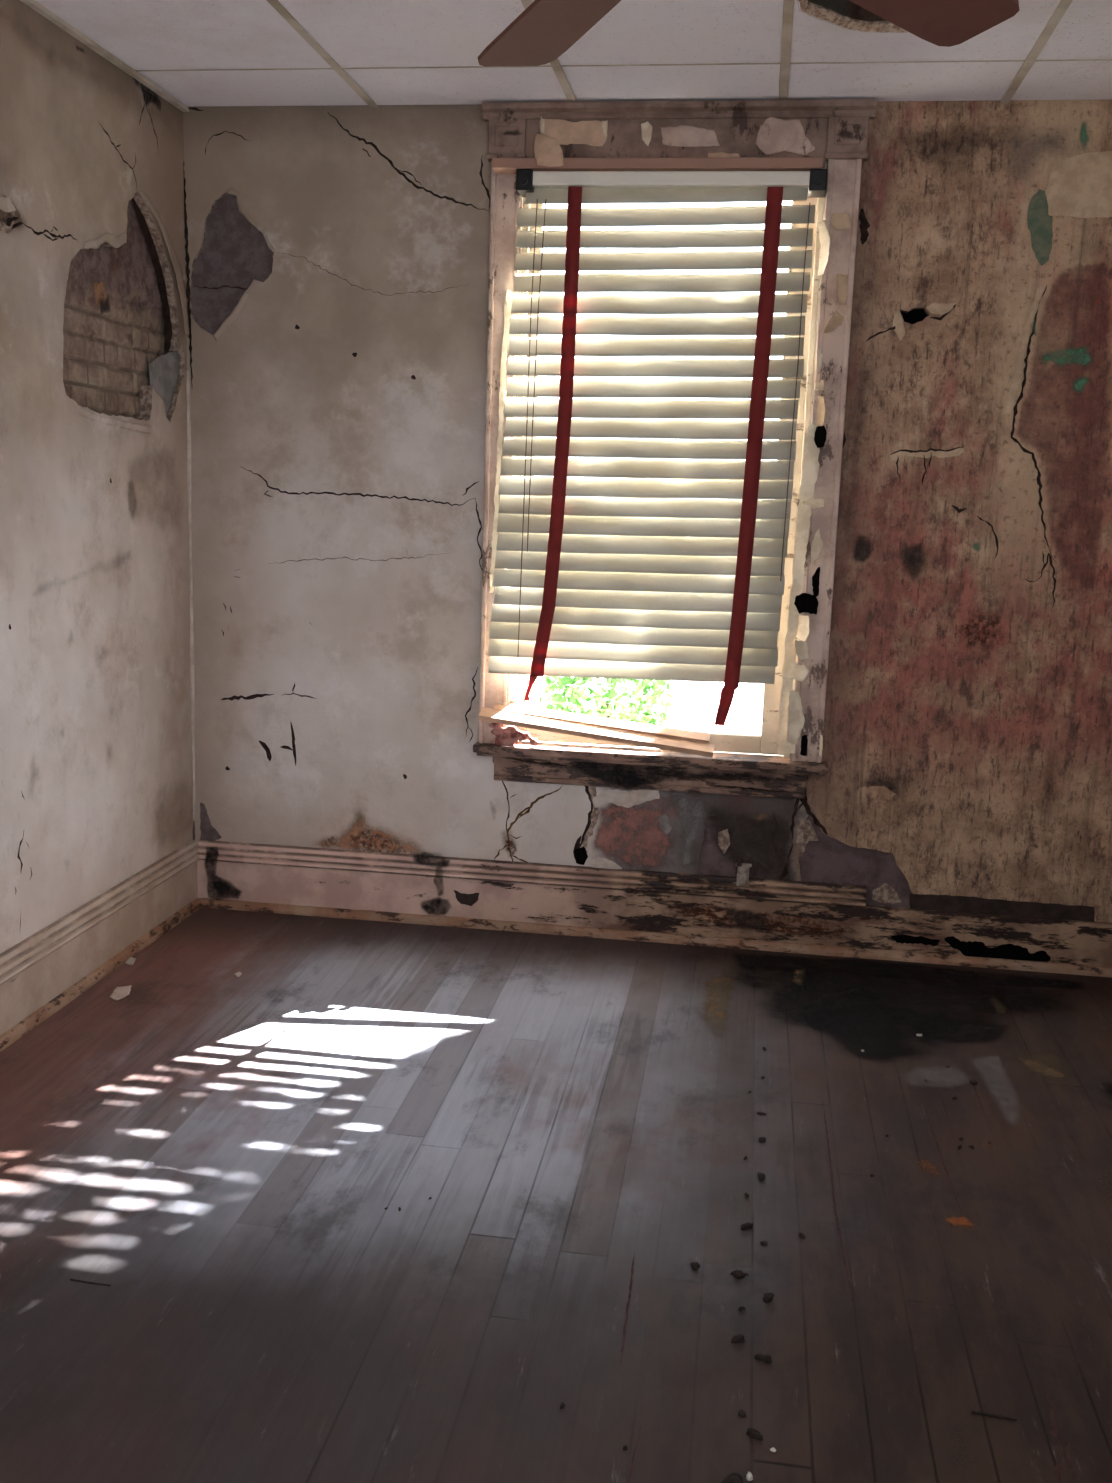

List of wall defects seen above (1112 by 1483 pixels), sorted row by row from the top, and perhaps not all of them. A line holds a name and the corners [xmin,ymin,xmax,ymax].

crack [320,113,491,222]
peeling [533,117,608,167]
peeling [755,117,815,155]
crack [22,222,77,241]
spalling [63,188,277,434]
crack [238,467,483,570]
peeling [777,213,852,757]
crack [221,683,317,701]
crack [494,757,600,865]
leakage [320,817,450,915]
peeling [891,935,1051,962]
leakage [735,954,1081,1058]